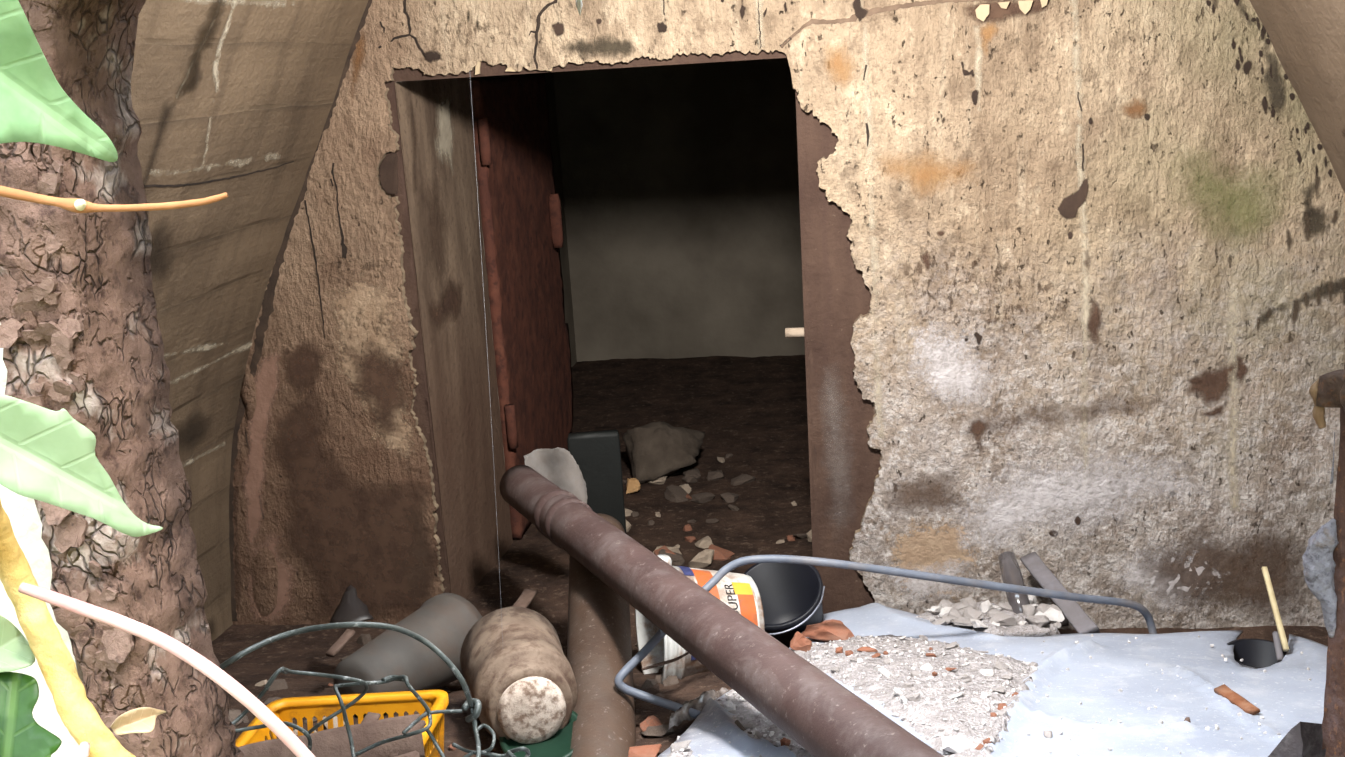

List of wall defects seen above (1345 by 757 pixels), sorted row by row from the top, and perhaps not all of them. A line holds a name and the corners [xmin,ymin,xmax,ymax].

crack [378,0,424,56]
crack [529,0,557,69]
crack [779,0,1049,48]
water stain [1231,0,1295,117]
water stain [1286,144,1337,251]
spalling [792,86,882,614]
flaking render [244,353,293,621]
water stain [276,349,434,616]
flaking render [880,517,979,599]